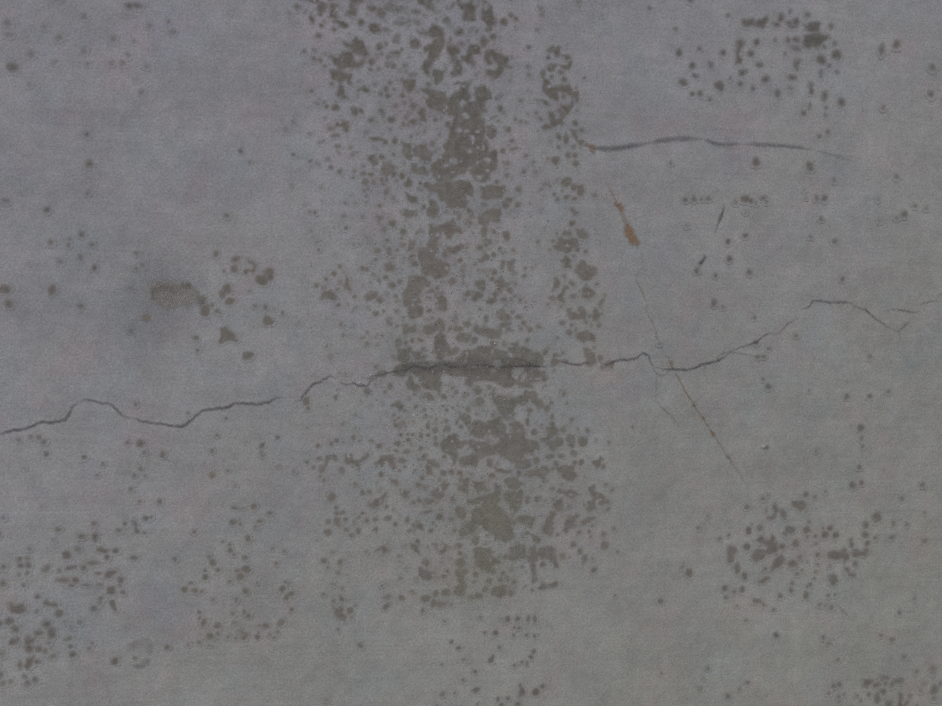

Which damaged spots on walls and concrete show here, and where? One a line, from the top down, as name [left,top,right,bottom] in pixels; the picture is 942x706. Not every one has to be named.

water stain [673,6,849,142]
water stain [182,248,304,363]
water stain [224,0,621,634]
water stain [0,437,168,691]
water stain [179,502,299,649]
water stain [716,488,911,625]
water stain [434,613,547,706]